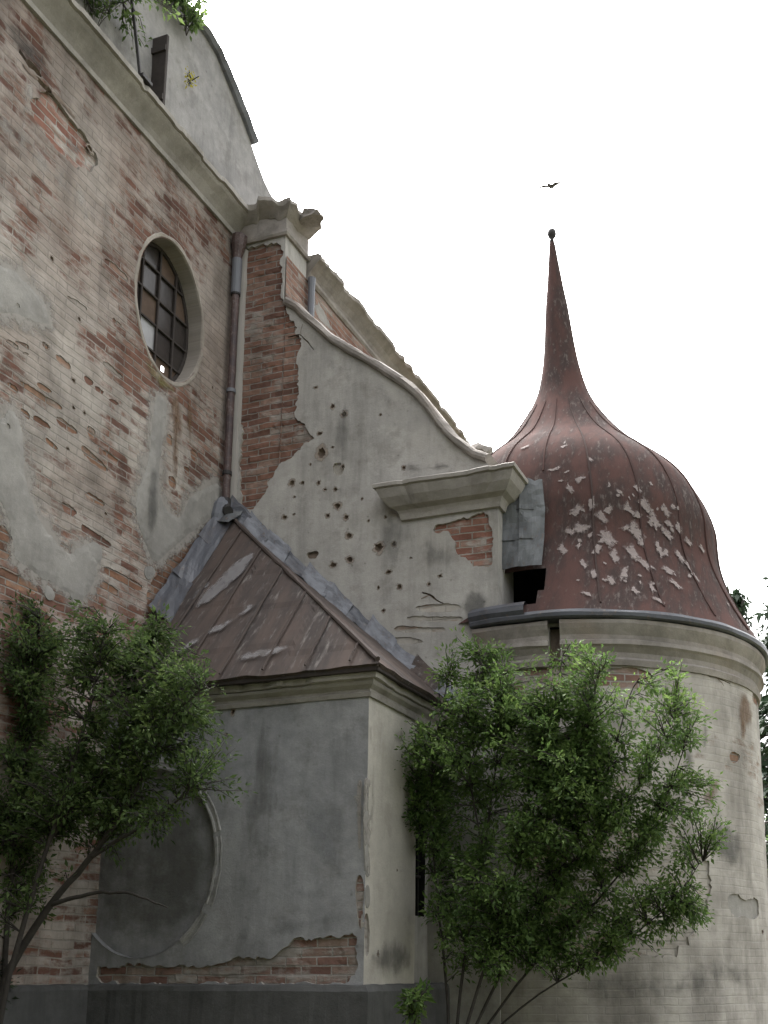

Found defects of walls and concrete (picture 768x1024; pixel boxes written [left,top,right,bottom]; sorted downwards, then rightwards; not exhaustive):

spalling [30,90,98,172]
peeling [0,256,119,405]
flaking render [238,242,323,510]
spalling [288,463,353,540]
flaking render [433,512,494,567]
peeling [548,466,705,603]
spalling [96,778,379,985]
spalling [728,894,759,919]